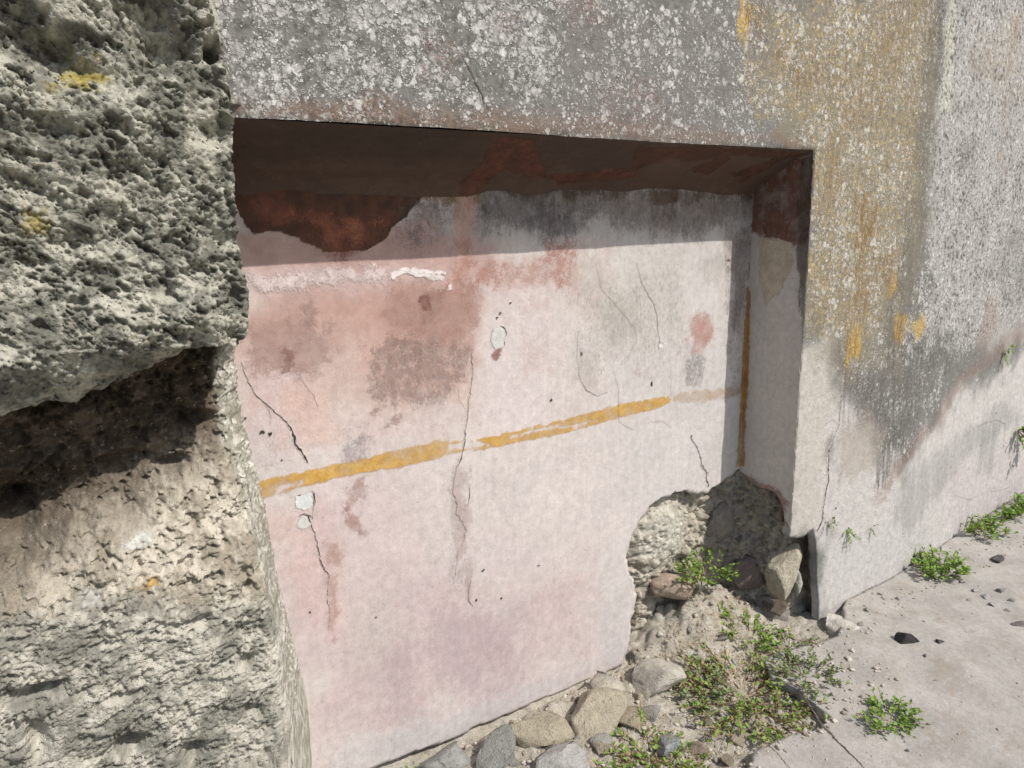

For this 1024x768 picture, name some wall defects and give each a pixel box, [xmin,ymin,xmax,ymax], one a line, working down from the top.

crack [241,362,308,463]
spalling [295,493,315,529]
crack [299,490,331,630]
crack [452,347,474,606]
spalling [626,469,810,634]
crack [817,385,842,531]